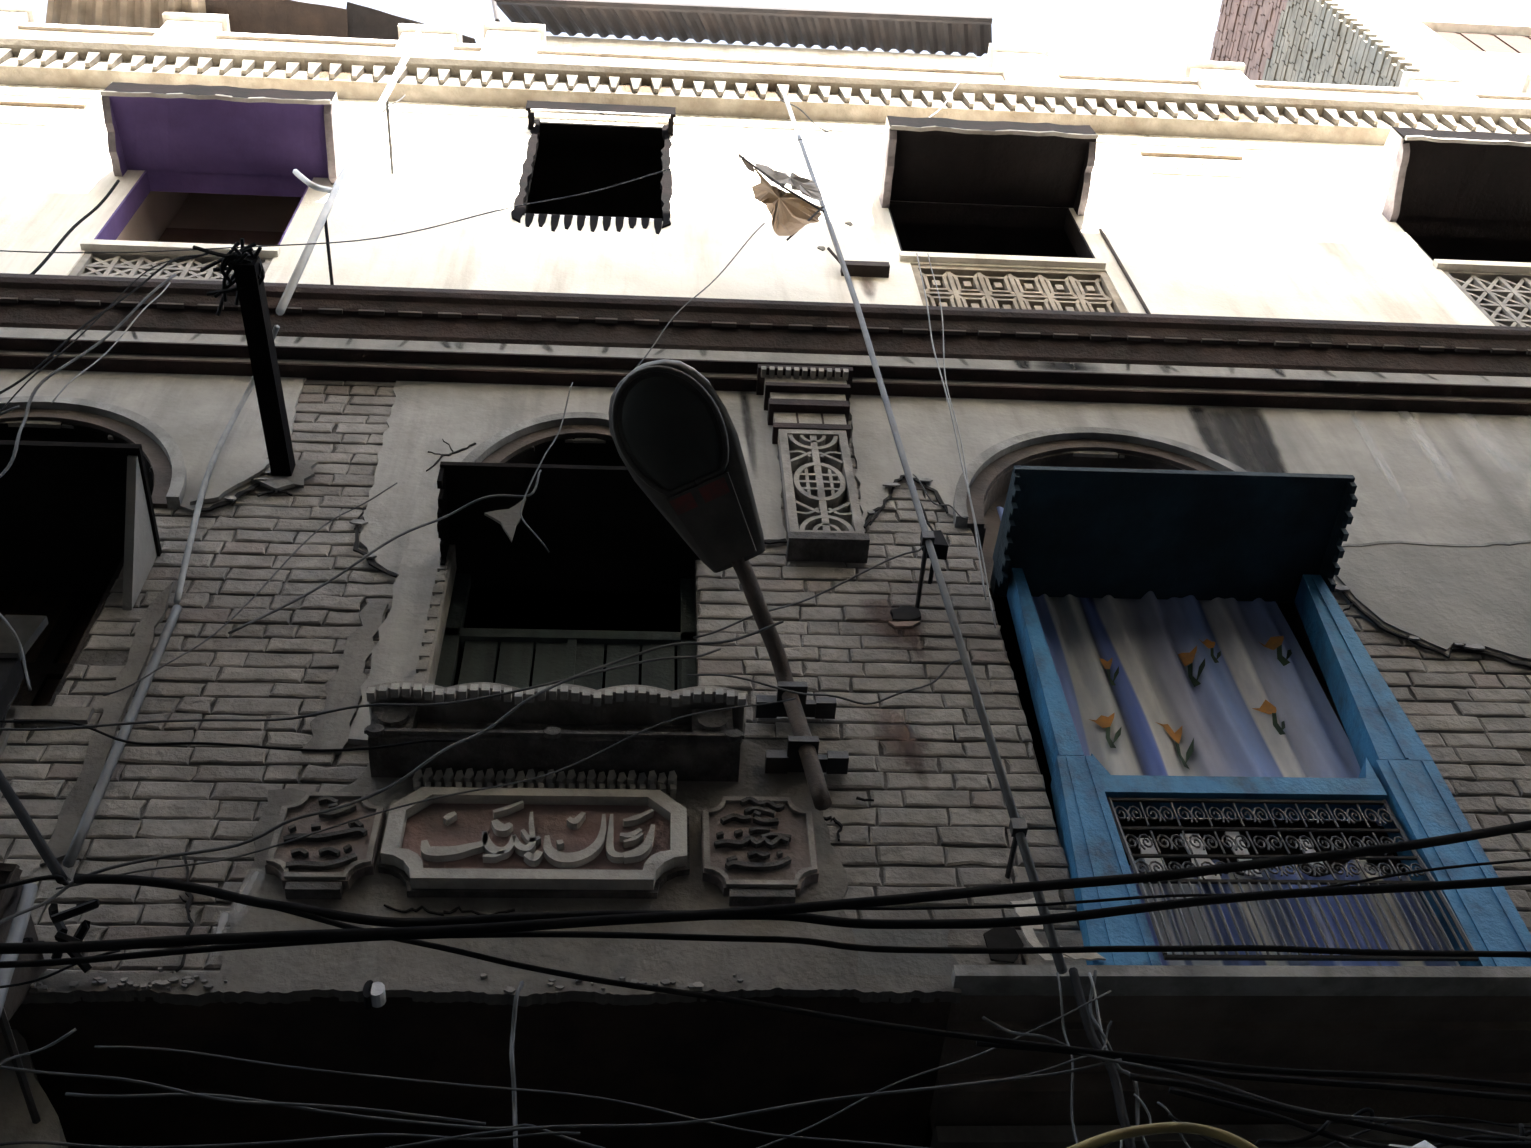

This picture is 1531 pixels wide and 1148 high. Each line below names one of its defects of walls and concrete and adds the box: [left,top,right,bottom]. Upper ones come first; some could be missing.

leakage [1190,406,1286,473]